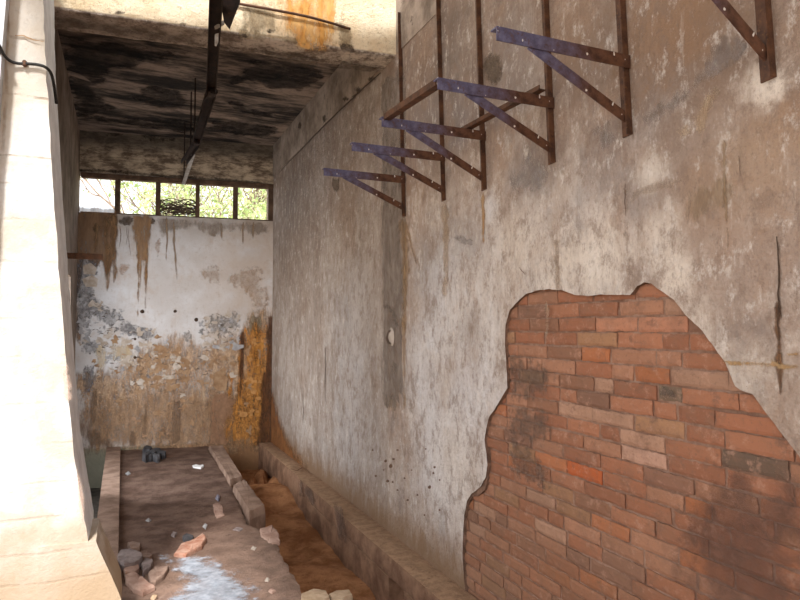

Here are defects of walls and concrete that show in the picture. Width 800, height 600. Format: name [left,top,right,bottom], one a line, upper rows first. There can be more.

damp [240,7,275,39]
corrosion [285,0,335,50]
damp [76,259,151,339]
peeling [76,263,262,435]
damp [161,218,178,267]
damp [233,222,266,242]
corrosion [226,316,303,465]
damp [382,69,406,409]
flaking render [462,282,800,600]
crack [775,236,783,343]